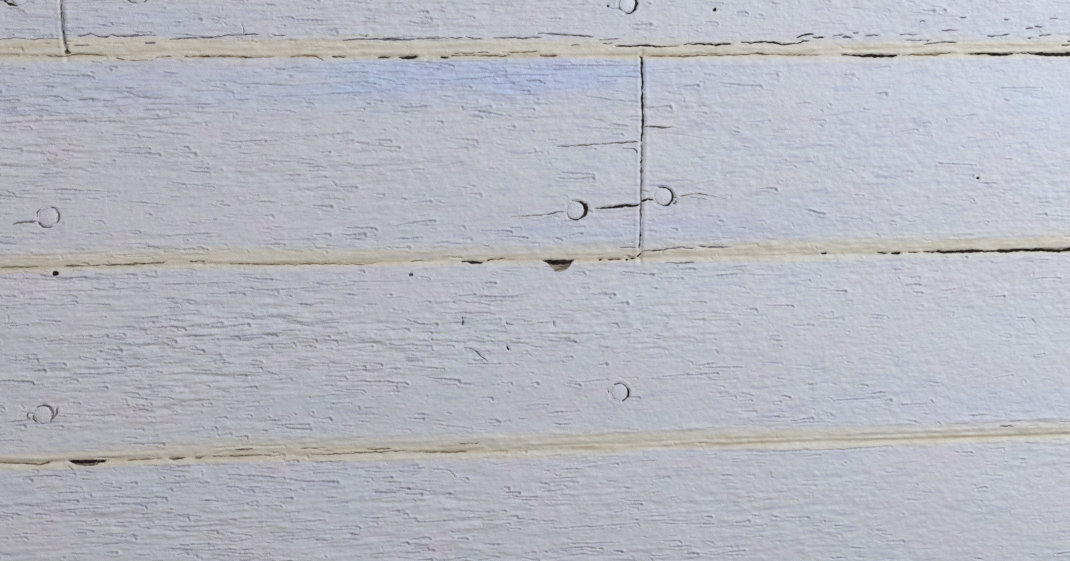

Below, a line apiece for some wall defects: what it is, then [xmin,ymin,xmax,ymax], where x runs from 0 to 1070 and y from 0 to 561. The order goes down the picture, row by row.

peeling [544,259,574,272]